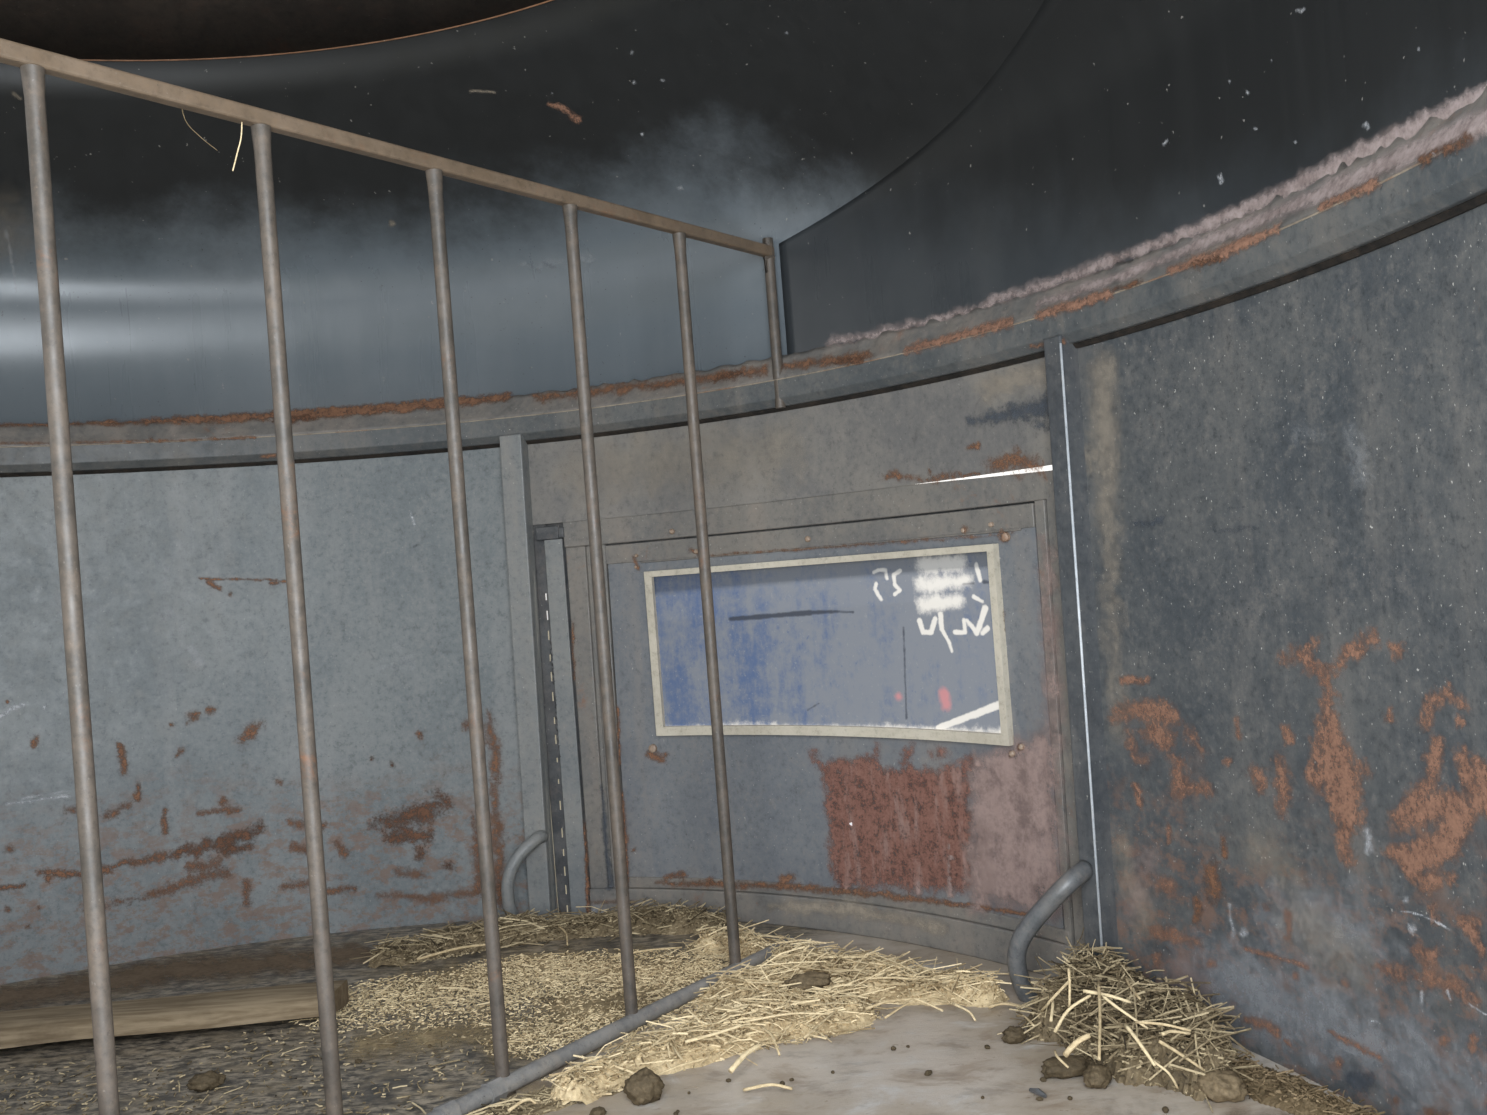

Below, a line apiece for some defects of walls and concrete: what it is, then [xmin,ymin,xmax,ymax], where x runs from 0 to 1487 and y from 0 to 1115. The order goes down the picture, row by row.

corrosion [1418,132,1473,164]
corrosion [1166,224,1281,275]
corrosion [69,392,511,458]
corrosion [532,351,871,403]
corrosion [0,869,81,912]
corrosion [104,743,141,819]
corrosion [102,796,265,905]
corrosion [371,713,505,908]
corrosion [656,725,1061,916]
corrosion [1111,676,1213,799]
corrosion [1279,628,1402,864]
corrosion [1385,683,1487,956]